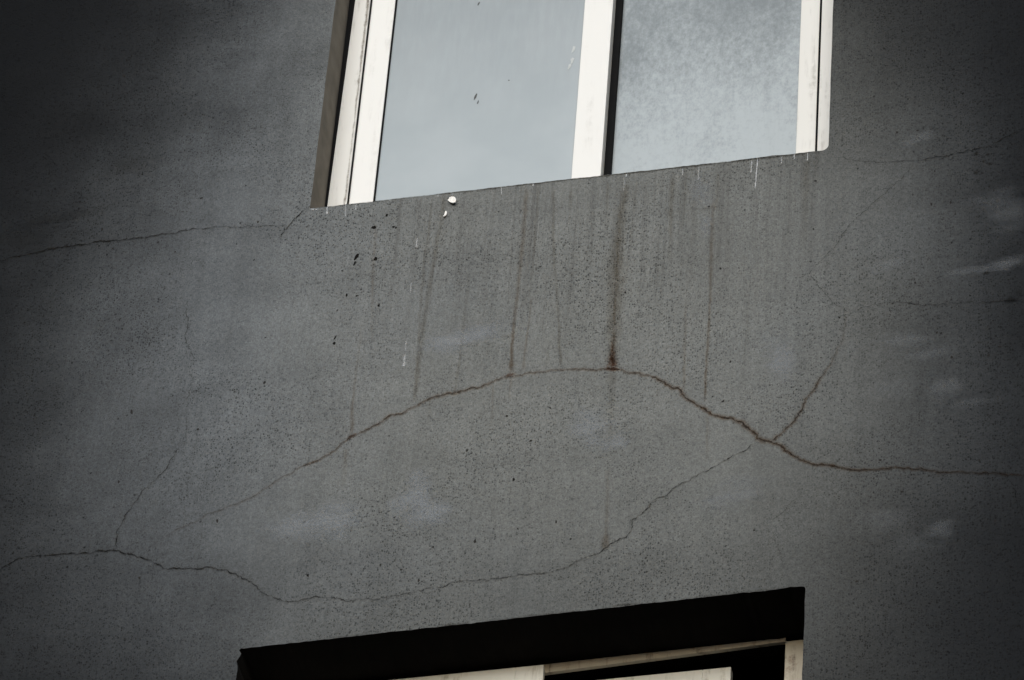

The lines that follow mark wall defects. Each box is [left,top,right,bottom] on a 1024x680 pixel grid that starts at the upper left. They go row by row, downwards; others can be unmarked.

crack [586,368,1017,556]